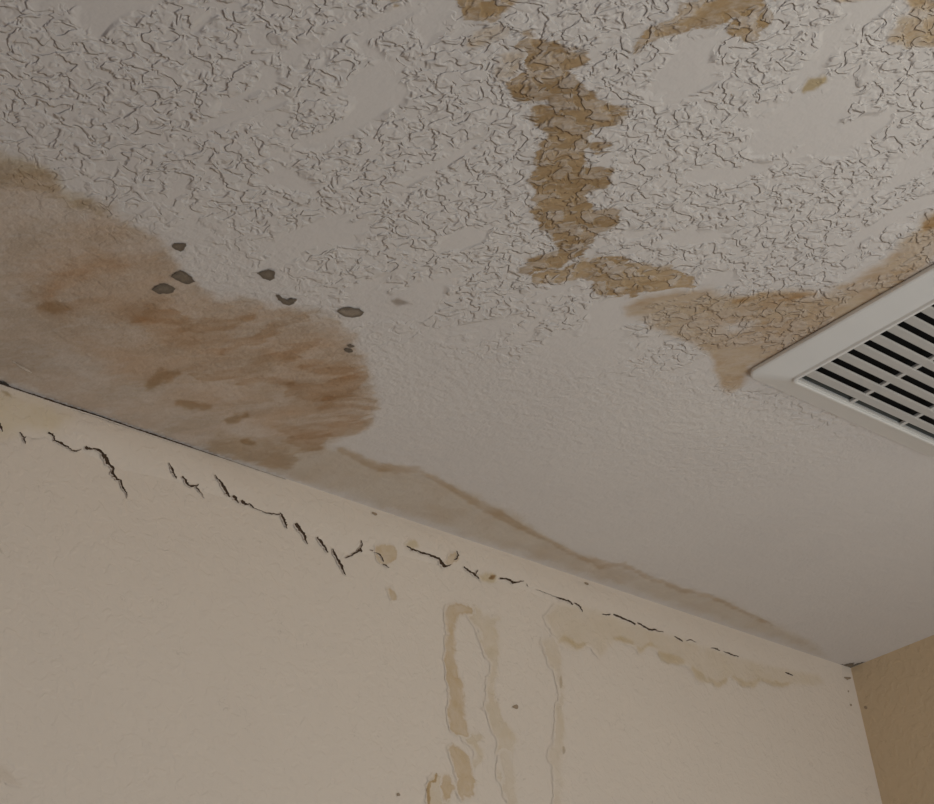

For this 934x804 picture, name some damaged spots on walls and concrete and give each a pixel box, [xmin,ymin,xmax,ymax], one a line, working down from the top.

damp [454,0,934,395]
damp [0,149,386,479]
crack [0,383,389,575]
damp [374,538,420,565]
damp [424,601,519,804]
crack [406,546,739,657]
damp [539,602,826,804]